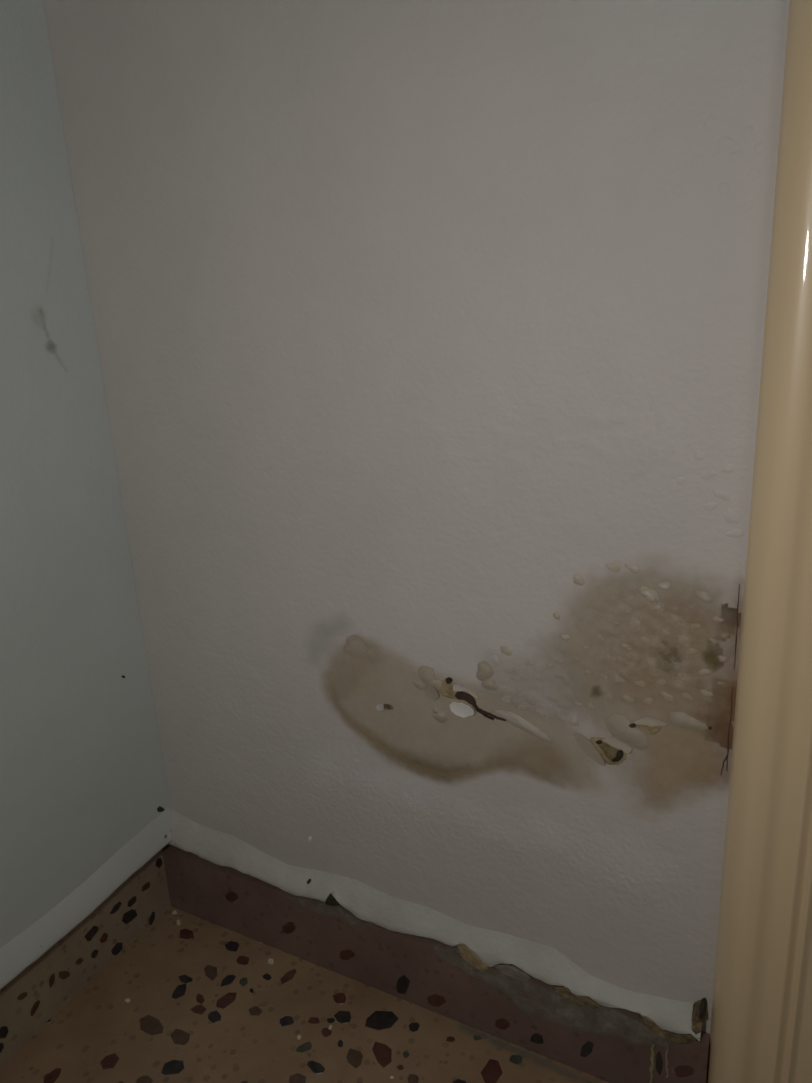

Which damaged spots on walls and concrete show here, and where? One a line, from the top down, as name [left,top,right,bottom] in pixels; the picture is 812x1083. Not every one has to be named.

peeling [425,677,479,718]
water stain [330,649,584,779]
flaking render [575,732,632,766]
water stain [563,585,717,796]
flaking render [435,943,707,1046]